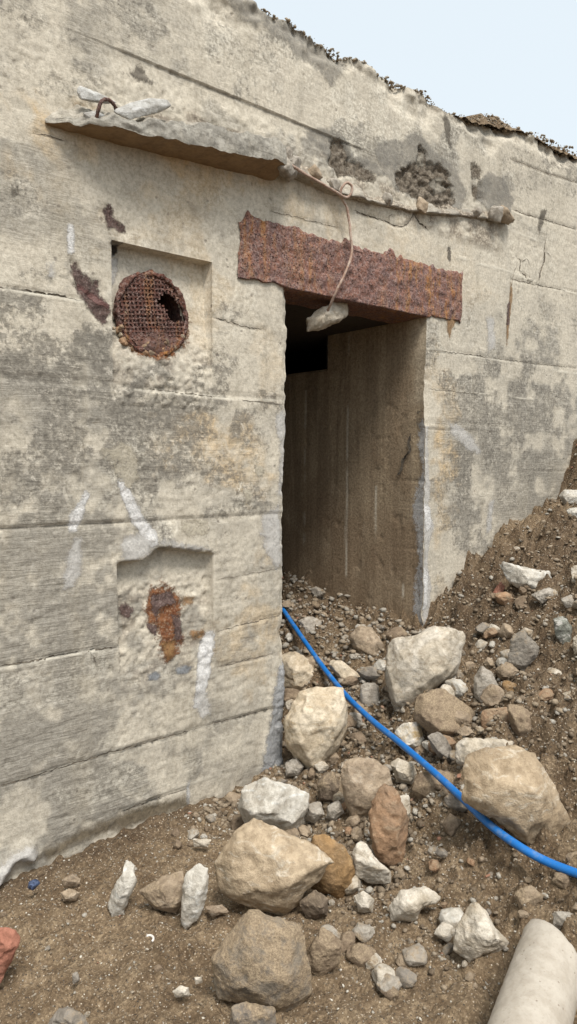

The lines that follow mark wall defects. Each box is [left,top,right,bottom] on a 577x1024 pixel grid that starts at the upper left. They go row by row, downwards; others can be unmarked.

spalling [328,137,377,182]
spalling [395,149,455,209]
rust [103,203,126,233]
rust [70,262,190,361]
rust [118,582,205,662]